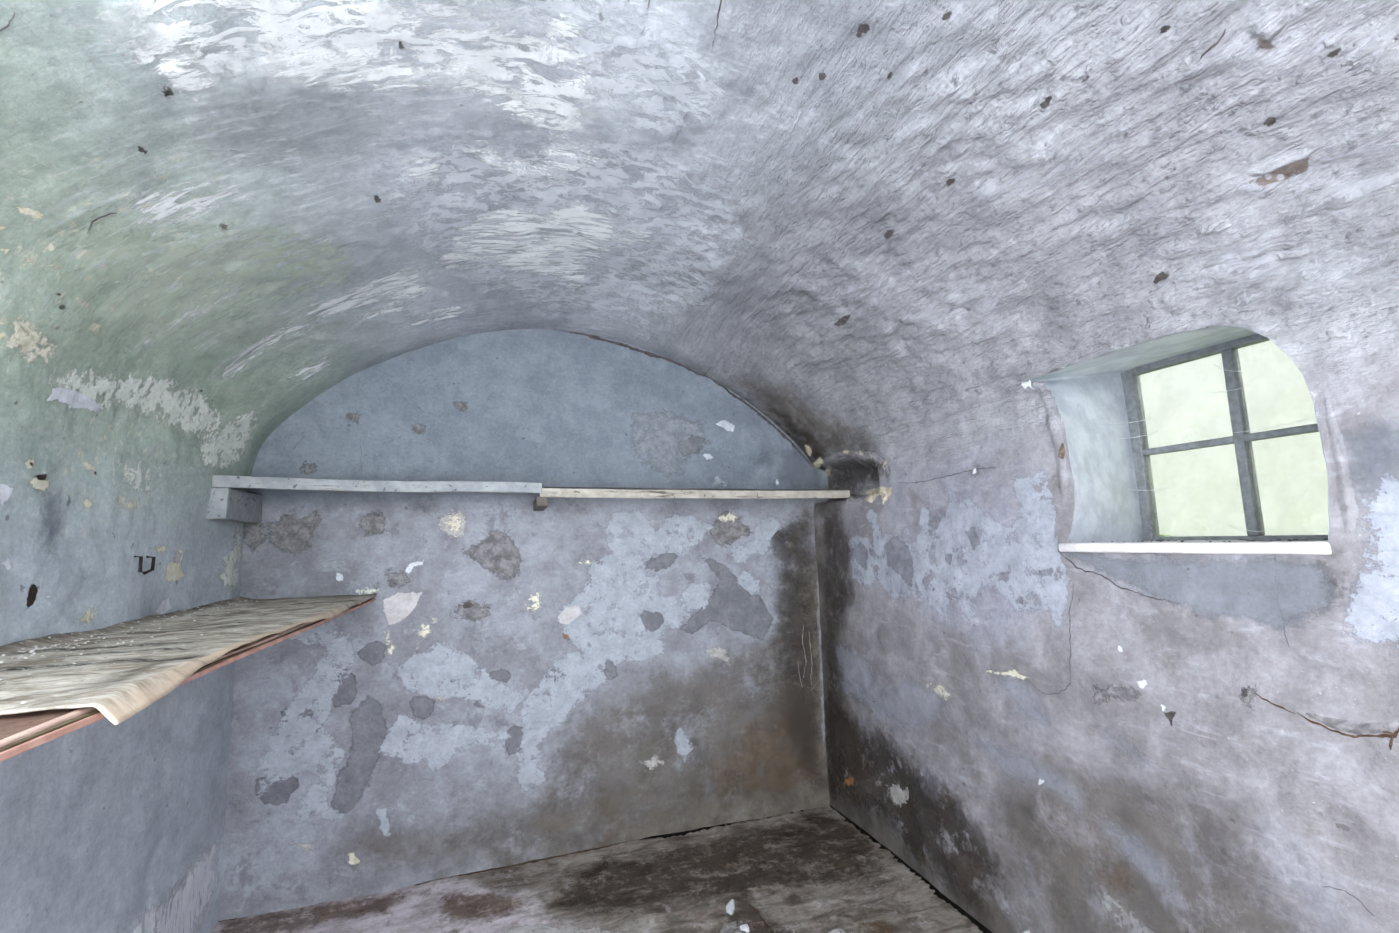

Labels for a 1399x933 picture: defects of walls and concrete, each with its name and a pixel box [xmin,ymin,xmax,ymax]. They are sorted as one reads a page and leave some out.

crack [712,0,722,49]
peeling [1342,473,1399,650]
peeling [255,507,782,824]
water stain [489,517,998,904]
crack [1248,686,1399,750]
spalling [1306,713,1399,735]
peeling [375,807,392,842]
water stain [551,814,882,933]